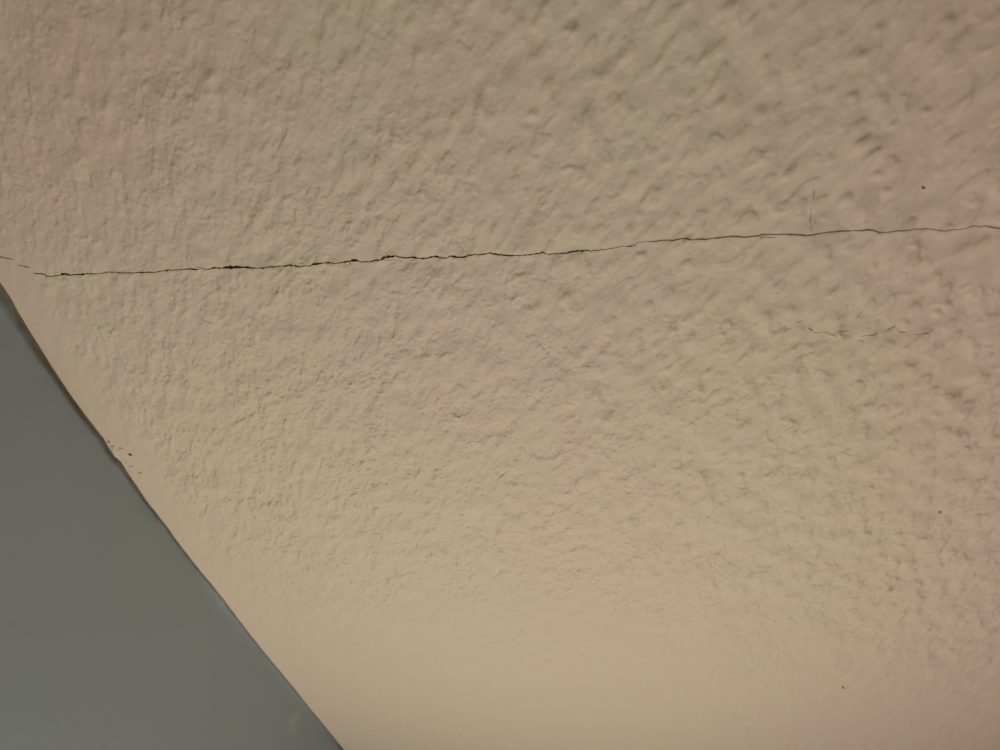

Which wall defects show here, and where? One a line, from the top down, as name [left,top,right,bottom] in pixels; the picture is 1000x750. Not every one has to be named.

crack [0,190,1000,279]